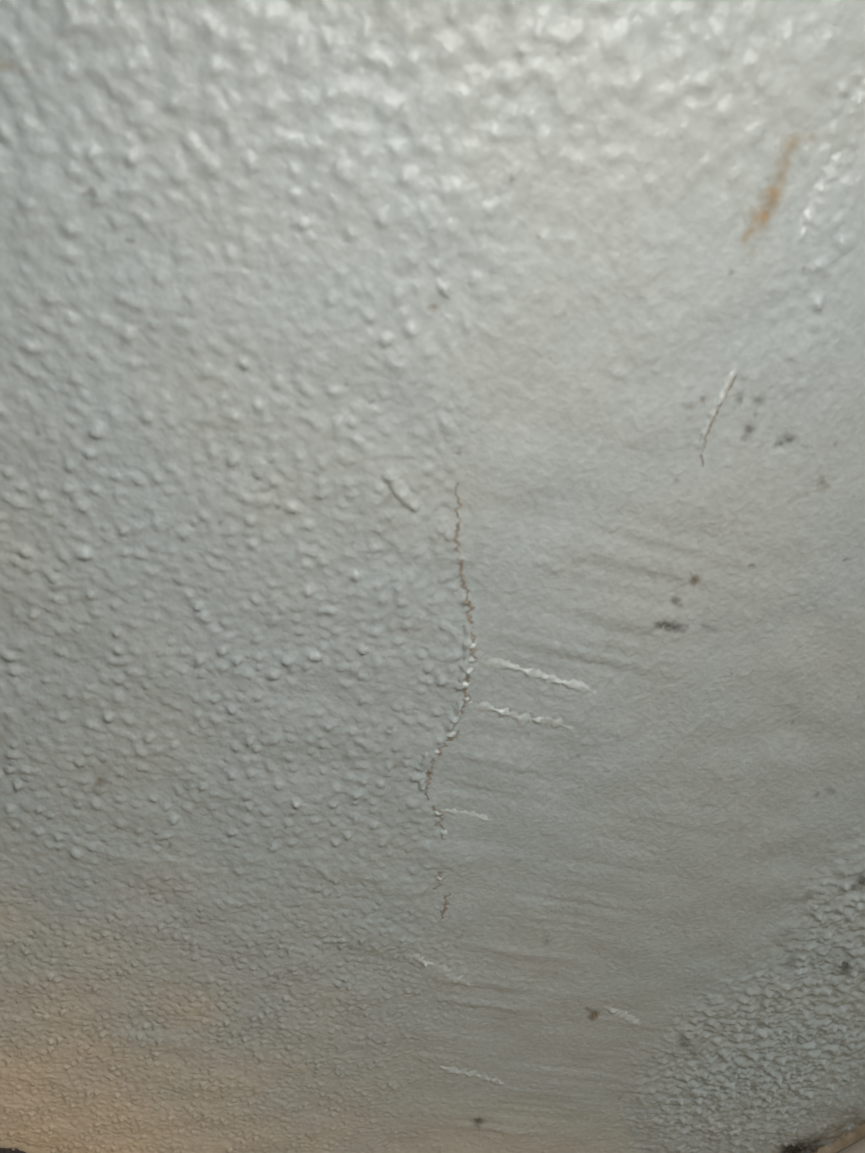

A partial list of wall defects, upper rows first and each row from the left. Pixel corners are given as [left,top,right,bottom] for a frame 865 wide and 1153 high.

crack [414,483,477,839]
crack [433,871,451,919]
crack [0,1145,26,1153]